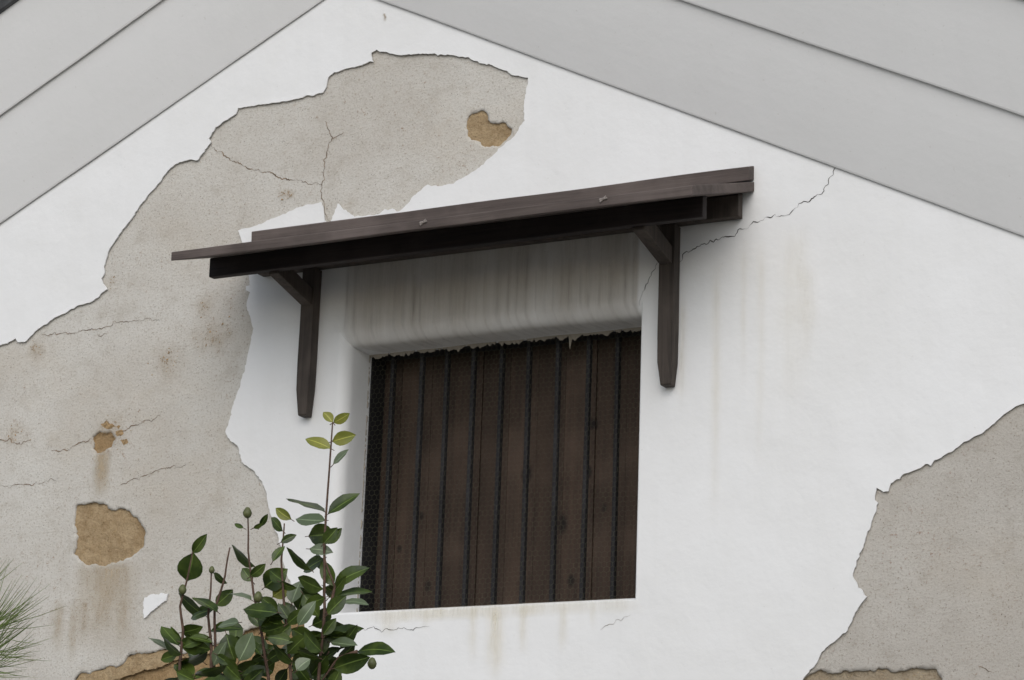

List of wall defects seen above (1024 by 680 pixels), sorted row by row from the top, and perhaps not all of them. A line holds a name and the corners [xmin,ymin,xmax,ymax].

crack [214,122,343,220]
crack [639,167,836,301]
crack [42,318,159,337]
peeling [0,50,528,680]
peeling [803,404,1024,680]